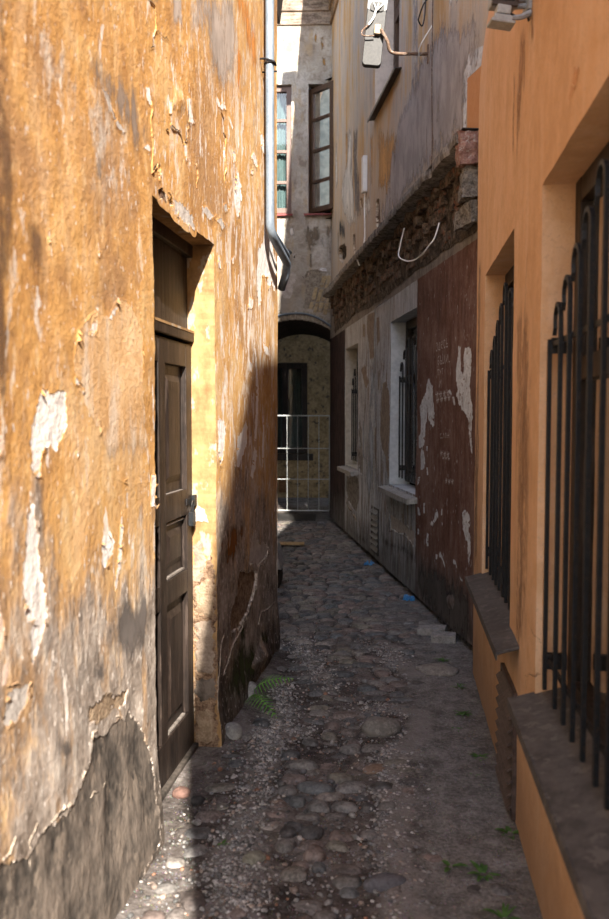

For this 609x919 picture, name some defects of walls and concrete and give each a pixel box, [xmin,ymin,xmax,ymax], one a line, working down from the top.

crack [149,0,168,48]
peeling [186,96,196,126]
peeling [216,96,233,130]
peeling [156,131,265,237]
spalling [247,45,484,516]
peeling [216,343,269,483]
peeling [0,297,159,738]
water stain [119,596,147,657]
crack [217,551,276,709]
water stain [58,737,71,756]
flaking render [0,680,163,919]